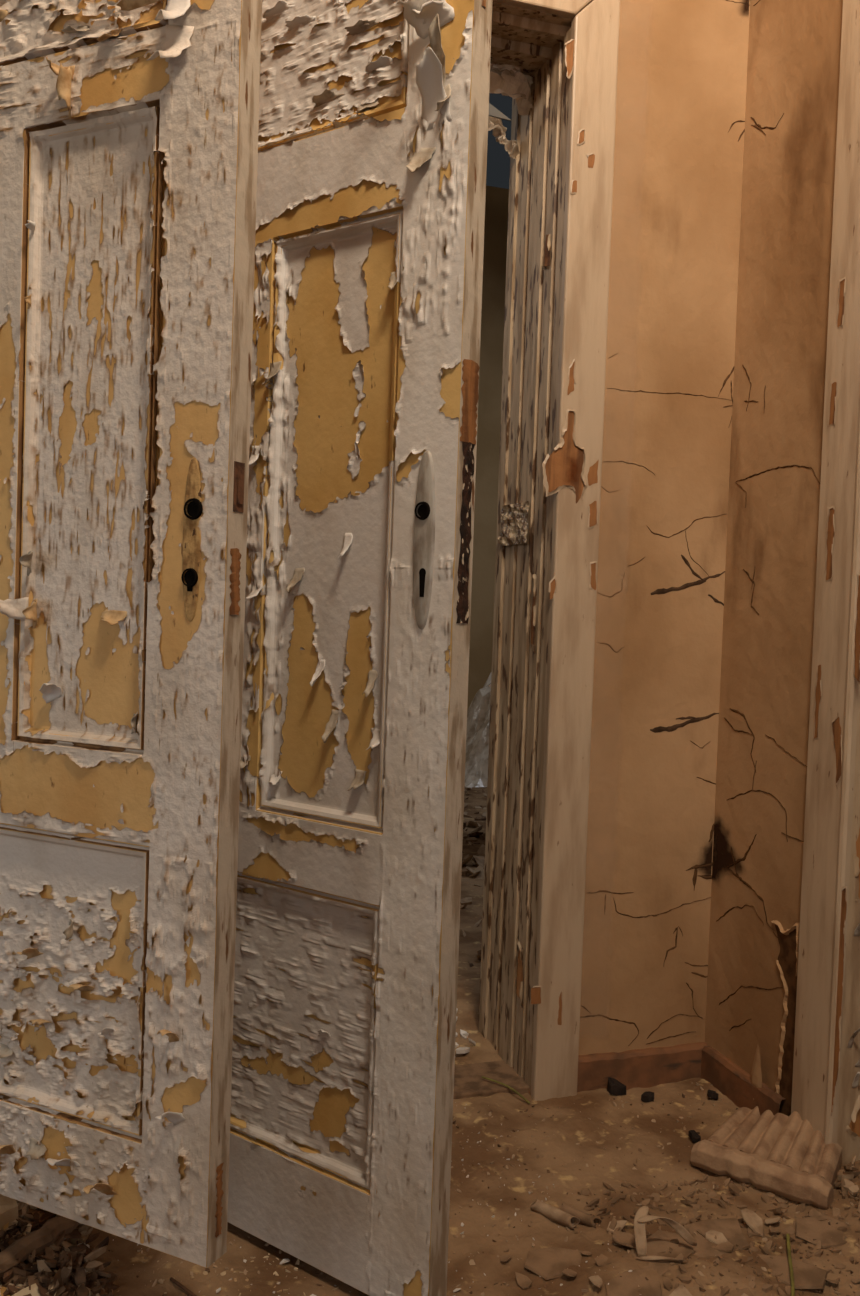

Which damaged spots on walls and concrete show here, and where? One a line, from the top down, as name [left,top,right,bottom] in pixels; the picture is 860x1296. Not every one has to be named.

peeling [117,0,194,61]
peeling [262,0,315,31]
peeling [312,89,344,109]
peeling [396,0,455,130]
crack [607,353,766,426]
peeling [542,359,599,529]
crack [597,461,820,598]
peeling [229,548,263,615]
crack [743,568,759,614]
crack [691,708,806,842]
flaking render [686,821,756,890]
crack [580,869,782,1044]